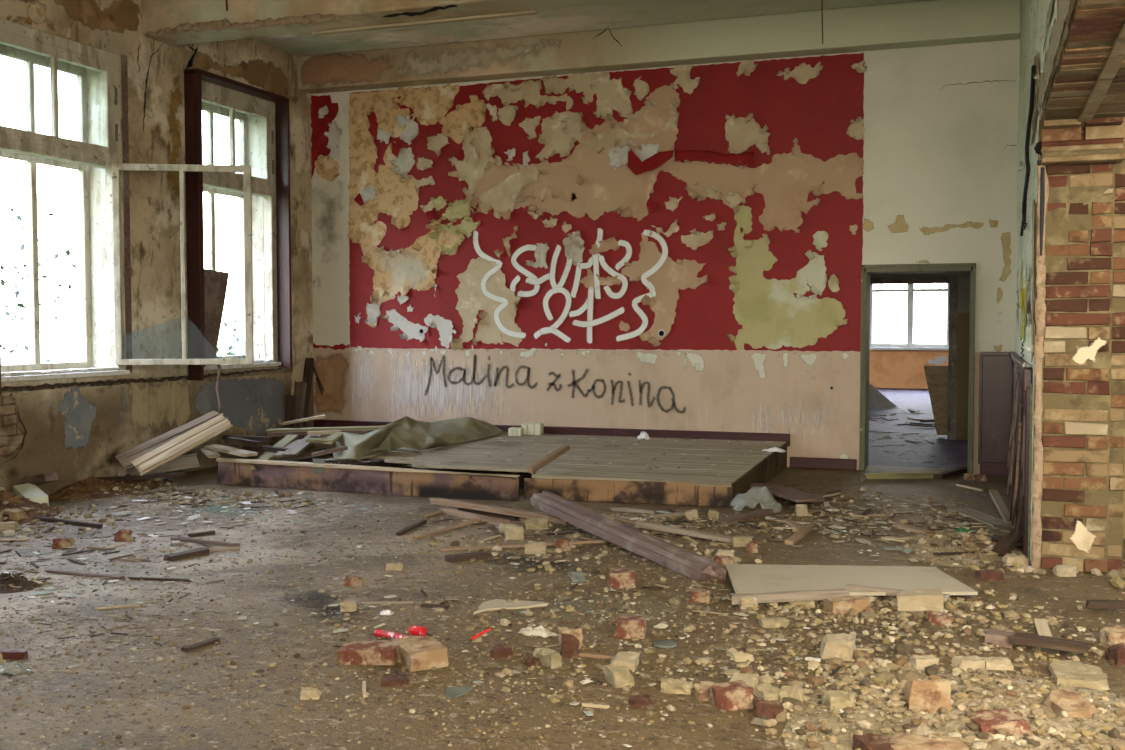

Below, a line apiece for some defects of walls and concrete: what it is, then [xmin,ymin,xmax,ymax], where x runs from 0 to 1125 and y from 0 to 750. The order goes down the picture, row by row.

flaking render [54,0,338,37]
crack [383,5,458,17]
spalling [1031,0,1072,146]
peeling [314,60,867,351]
spalling [850,219,874,235]
spalling [888,215,1012,304]